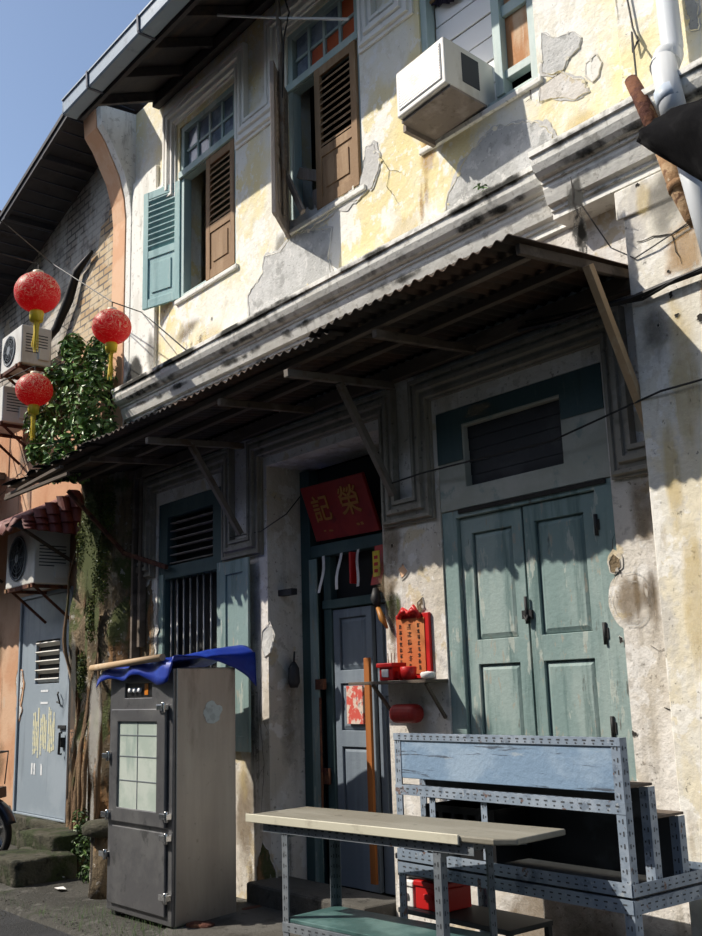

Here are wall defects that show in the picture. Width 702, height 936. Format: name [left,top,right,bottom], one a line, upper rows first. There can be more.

flaking render [538,31,603,103]
flaking render [247,140,381,317]
water stain [448,174,519,233]
flaking render [444,119,558,212]
water stain [567,176,588,253]
water stain [216,289,310,373]
water stain [634,489,651,536]
flaking render [607,549,623,574]
water stain [619,575,657,618]
water stain [67,645,76,799]
water stain [90,686,100,769]